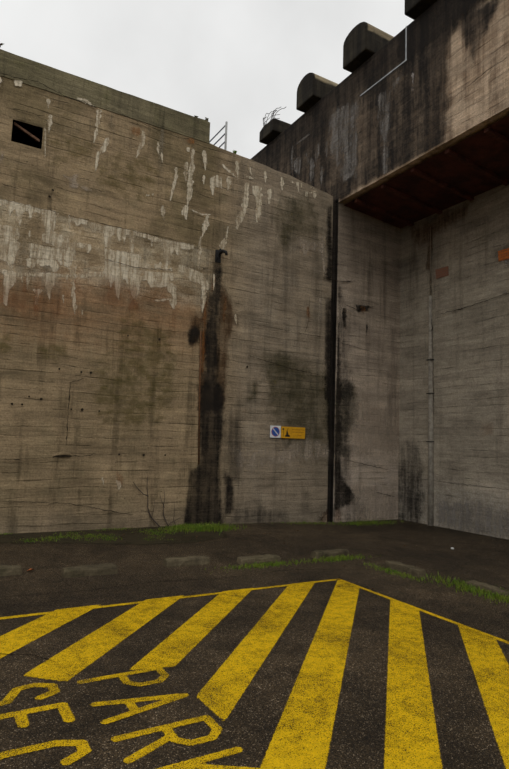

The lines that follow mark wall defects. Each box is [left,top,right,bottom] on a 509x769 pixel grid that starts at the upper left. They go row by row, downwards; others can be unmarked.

damp [0,0,498,525]
spalling [338,304,369,327]
crack [4,378,94,460]